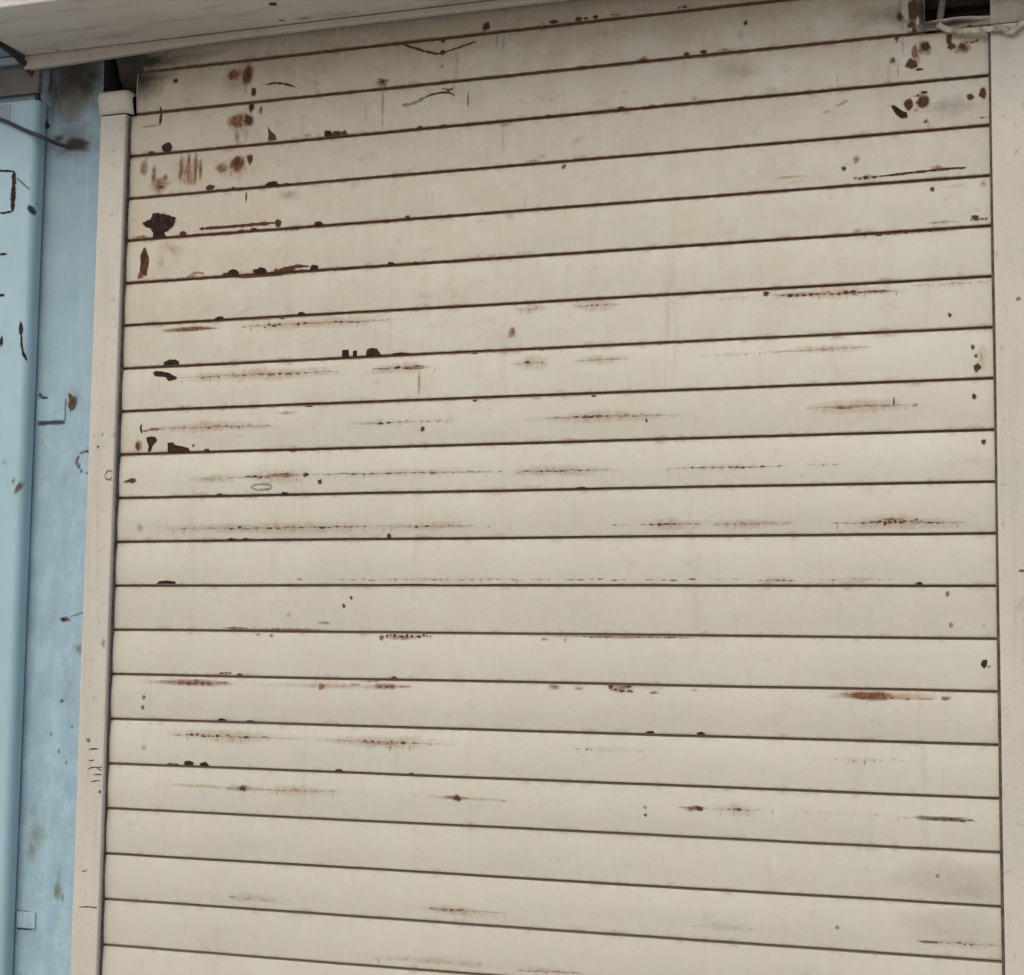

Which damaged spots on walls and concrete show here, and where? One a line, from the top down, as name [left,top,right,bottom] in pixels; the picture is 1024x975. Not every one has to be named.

corrosion [886,0,988,78]
corrosion [890,90,932,120]
corrosion [965,85,987,102]
corrosion [138,61,264,194]
corrosion [840,154,988,193]
corrosion [199,264,319,279]
corrosion [712,278,992,304]
corrosion [507,299,625,340]
corrosion [778,393,945,418]
corrosion [607,512,986,534]
corrosion [813,690,953,703]
corrosion [410,793,527,803]